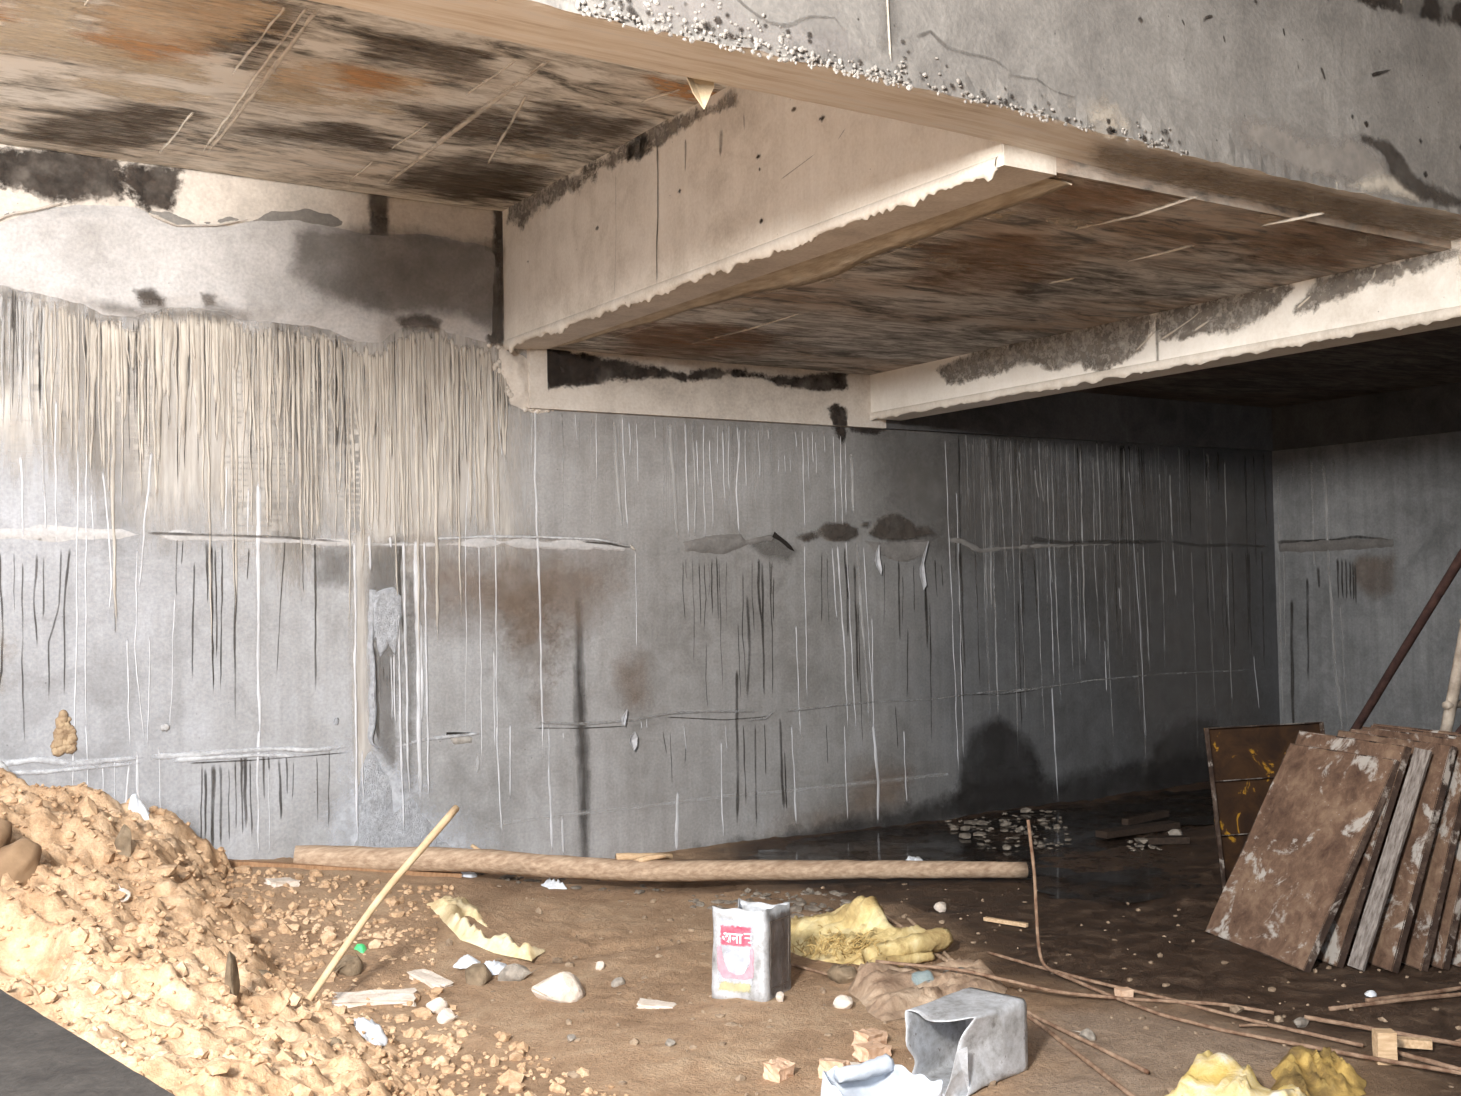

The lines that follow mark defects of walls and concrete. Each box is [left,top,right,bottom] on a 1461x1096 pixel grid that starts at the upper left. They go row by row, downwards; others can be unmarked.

damp [202,3,306,70]
damp [349,31,501,83]
spalling [600,0,767,41]
damp [0,93,736,848]
damp [793,439,1267,836]